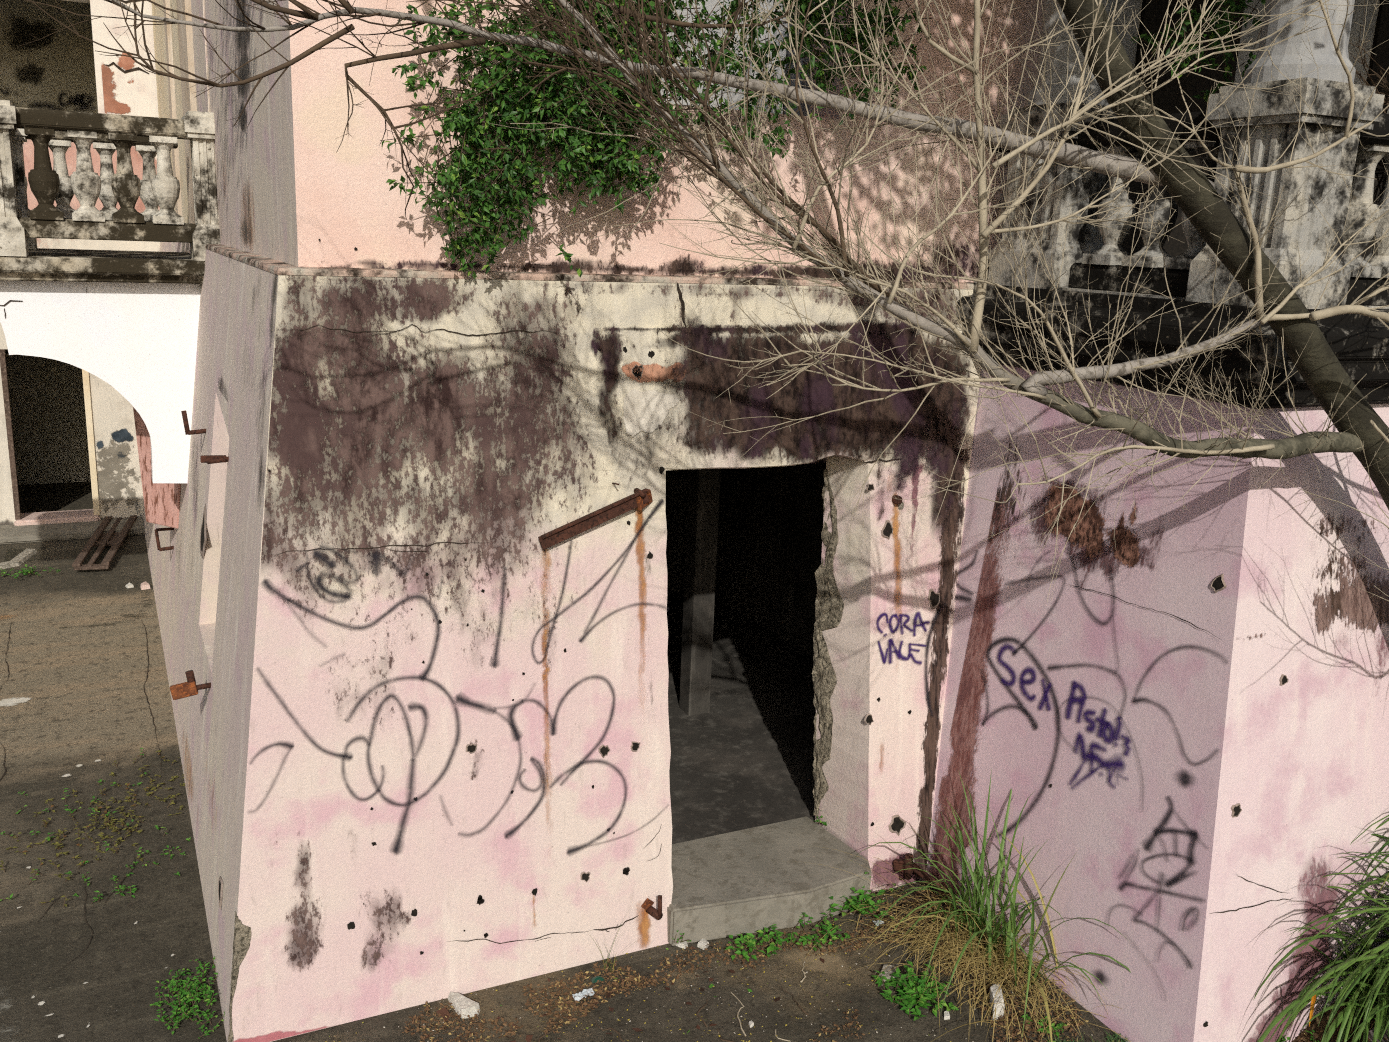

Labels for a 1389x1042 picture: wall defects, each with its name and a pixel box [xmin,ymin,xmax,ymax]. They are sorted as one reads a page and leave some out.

peeling [622,346,686,437]
rust [538,488,653,635]
damp [244,238,979,889]
rust [893,494,901,603]
spalling [1043,483,1141,568]
spalling [1311,513,1389,636]
spalling [812,469,844,816]
spalling [218,876,251,1042]
mould [284,843,323,969]
mould [362,890,411,969]
crack [449,915,639,944]